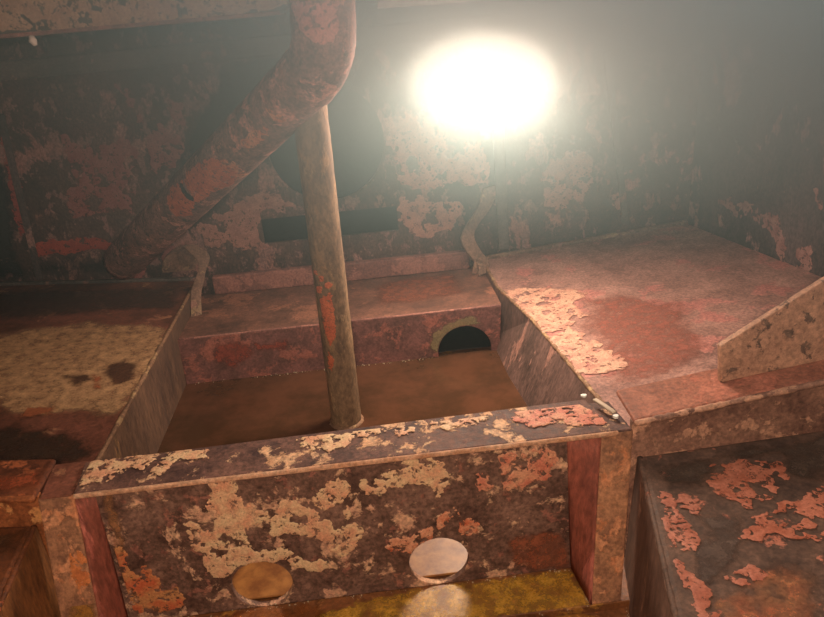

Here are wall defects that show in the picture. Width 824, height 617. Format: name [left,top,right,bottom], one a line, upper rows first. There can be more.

peeling [0,0,340,46]
peeling [384,107,491,239]
leakage [0,288,175,317]
leakage [0,427,90,462]
peeling [183,457,451,578]
peeling [385,507,480,554]
rust [316,572,589,617]